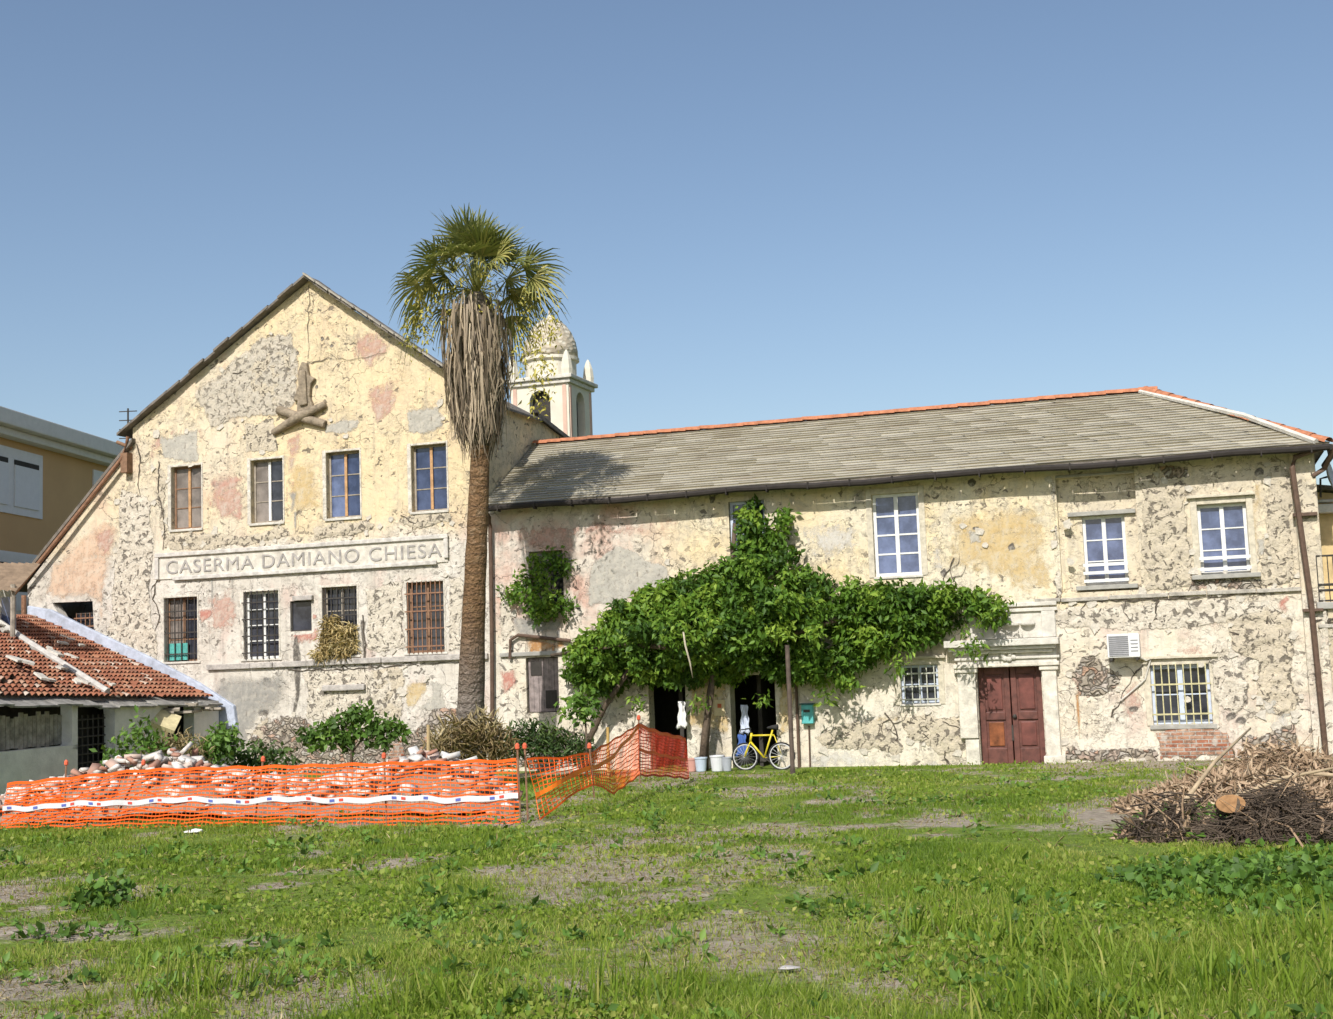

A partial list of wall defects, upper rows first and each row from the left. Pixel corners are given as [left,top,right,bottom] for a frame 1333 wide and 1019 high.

spalling [811,707,977,767]
spalling [955,462,1304,761]